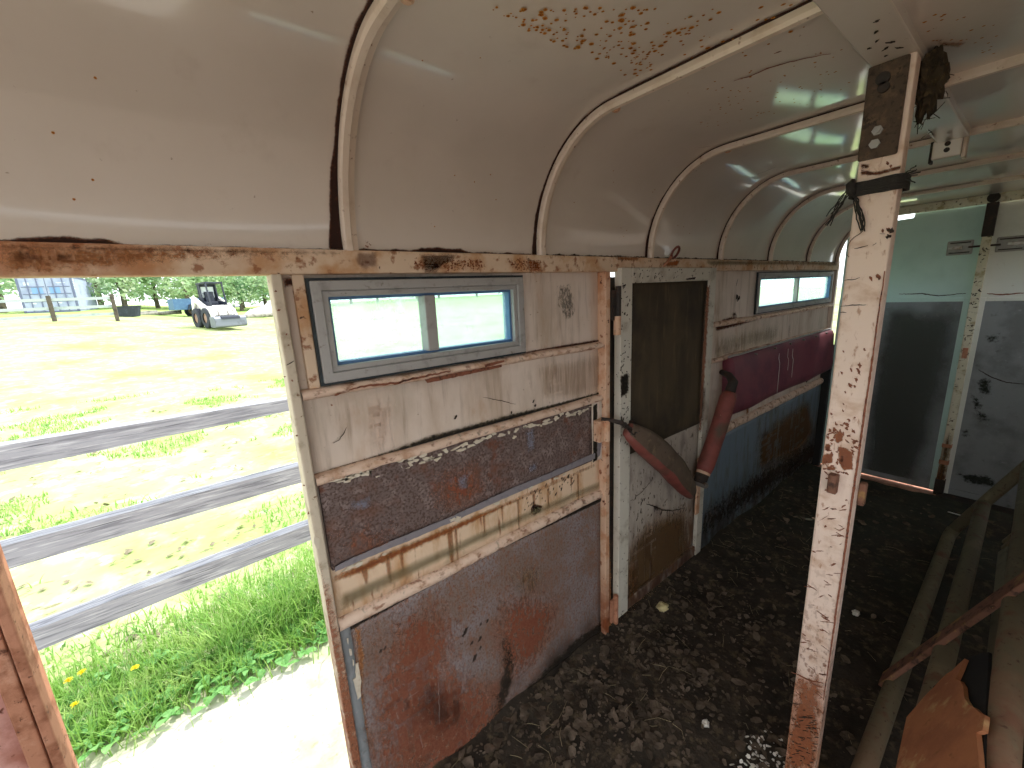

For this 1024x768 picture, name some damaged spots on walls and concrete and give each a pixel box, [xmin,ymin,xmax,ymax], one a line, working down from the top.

corrosion [493,0,813,273]
corrosion [1,245,263,272]
corrosion [414,254,485,272]
peeling [329,406,592,483]
peeling [335,442,602,572]
corrosion [785,271,885,768]
corrosion [323,498,601,768]